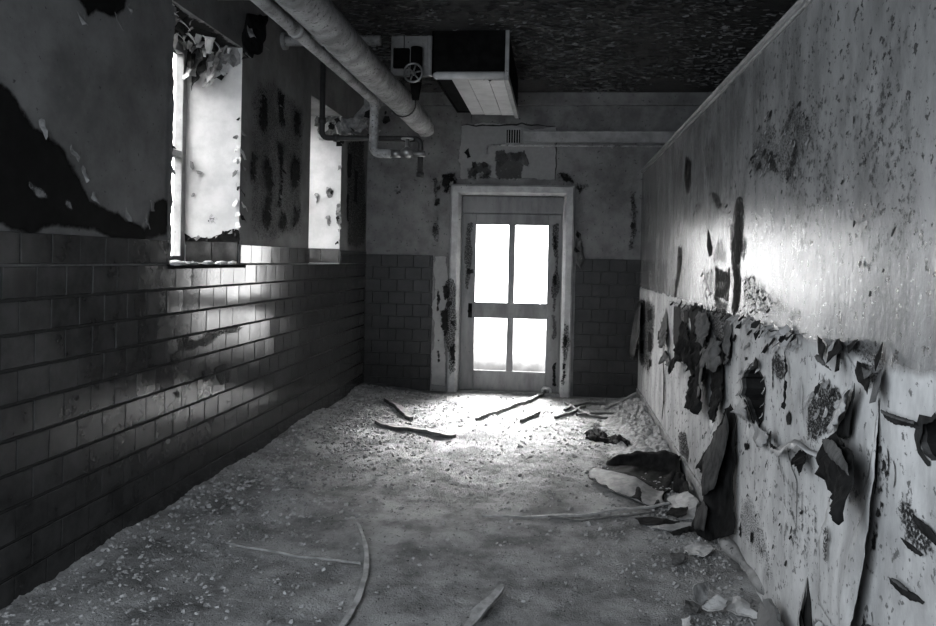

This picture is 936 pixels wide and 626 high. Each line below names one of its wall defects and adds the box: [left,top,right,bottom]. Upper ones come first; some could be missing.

peeling [0,0,270,257]
peeling [205,81,340,242]
peeling [346,141,366,247]
flaking render [432,122,589,242]
leakage [714,197,746,315]
flaking render [431,256,449,386]
flaking render [673,306,689,346]
flaking render [707,311,733,366]
spalling [735,357,766,427]
leakage [786,374,842,441]